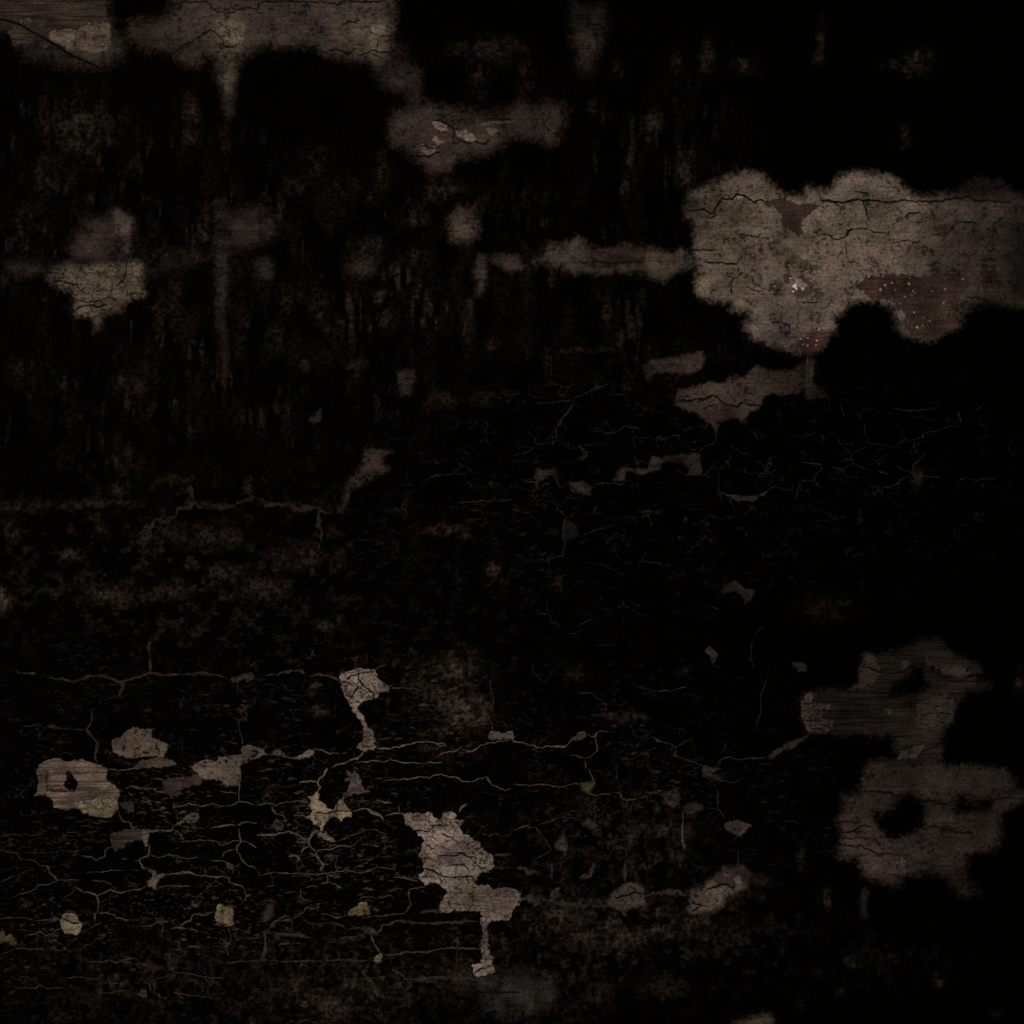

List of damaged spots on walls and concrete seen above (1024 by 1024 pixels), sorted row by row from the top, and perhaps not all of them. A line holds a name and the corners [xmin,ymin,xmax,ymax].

crack [0,18,117,85]
peeling [496,169,1024,430]
crack [513,384,608,456]
crack [594,394,999,510]
crack [138,485,330,554]
crack [13,642,418,745]
peeling [339,656,389,752]
peeling [34,758,135,818]
peeling [112,727,314,799]
crack [2,681,767,998]
crack [837,790,1023,878]
peeling [404,812,522,977]